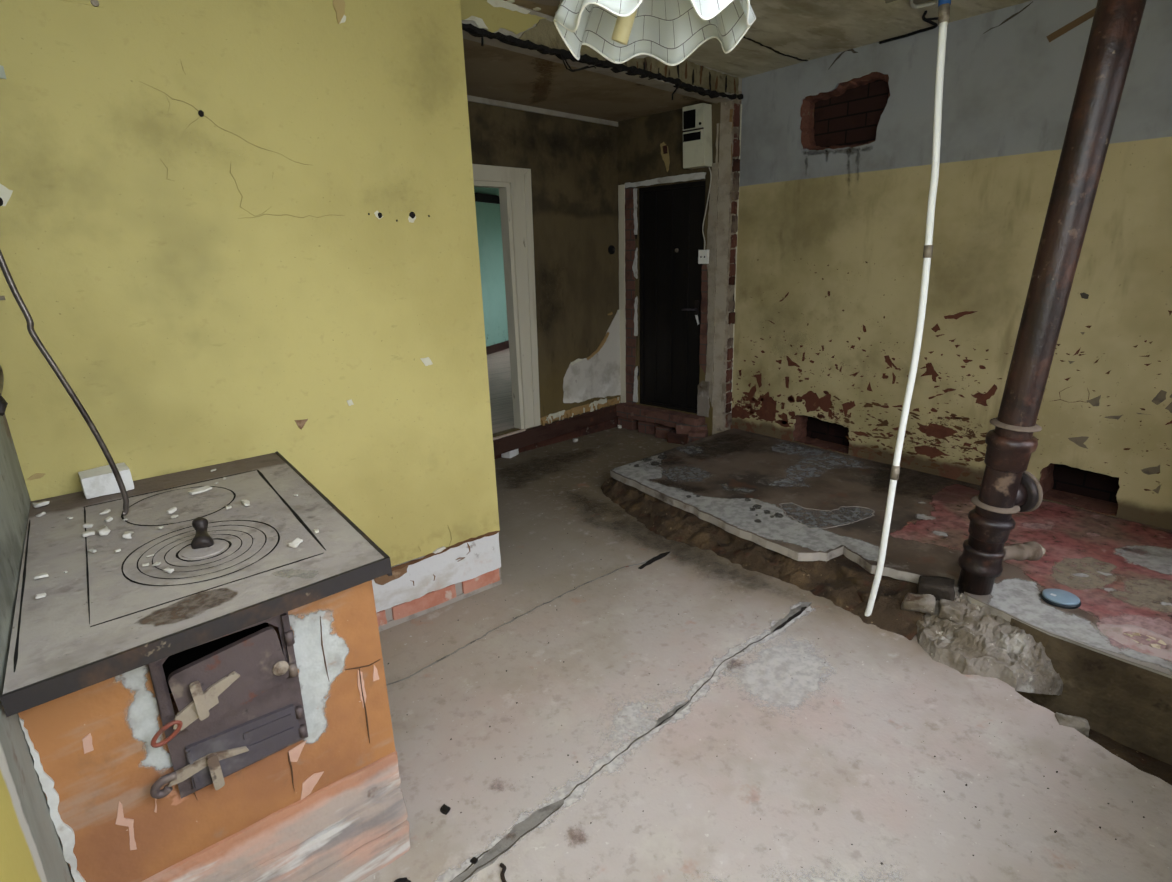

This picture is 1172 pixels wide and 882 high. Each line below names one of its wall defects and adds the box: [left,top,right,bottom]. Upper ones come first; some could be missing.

crack [743,36,858,70]
crack [983,1,1033,34]
crack [142,63,345,219]
spalling [368,211,430,223]
flaking render [460,0,1002,552]
peeling [1055,326,1122,420]
peeling [1133,340,1172,426]
peeling [1068,436,1099,449]
peeling [1123,443,1170,494]
flaking render [372,531,502,632]
peeling [1004,501,1172,664]
spalling [916,592,1063,696]